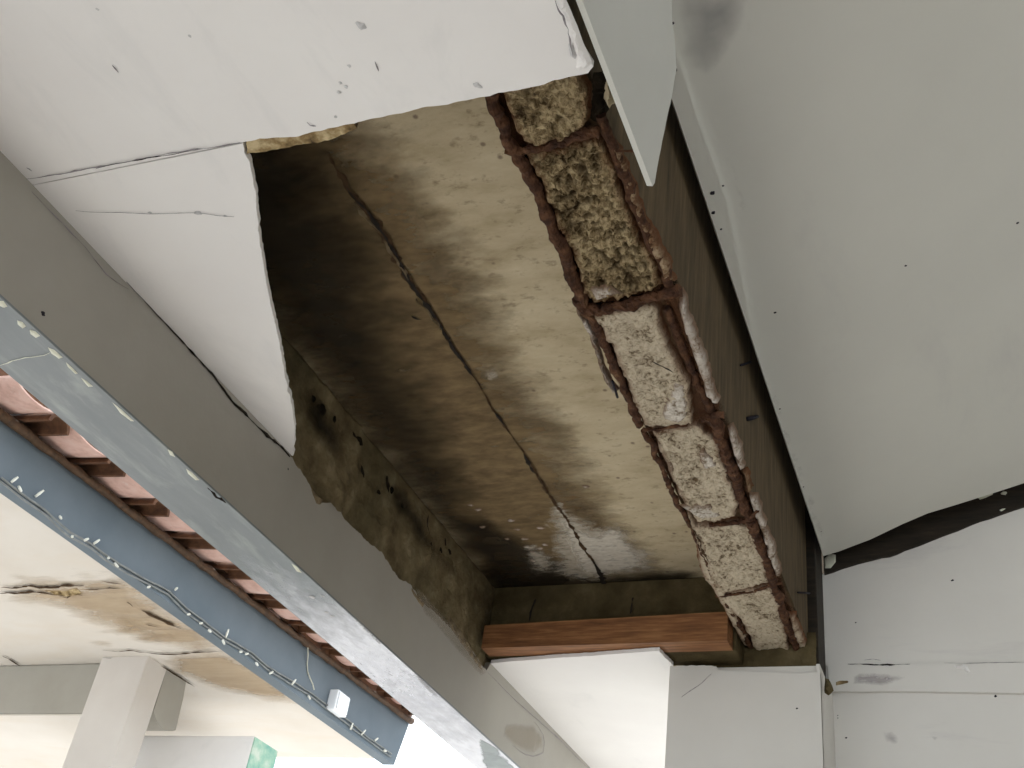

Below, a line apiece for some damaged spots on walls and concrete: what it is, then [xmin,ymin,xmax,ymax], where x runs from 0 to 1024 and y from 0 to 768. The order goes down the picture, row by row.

spalling [246,115,358,154]
rust [499,92,564,235]
crack [30,142,290,457]
crack [328,153,606,584]
damp [246,132,690,588]
rust [587,271,764,540]
damp [37,583,205,642]
damp [179,658,284,696]